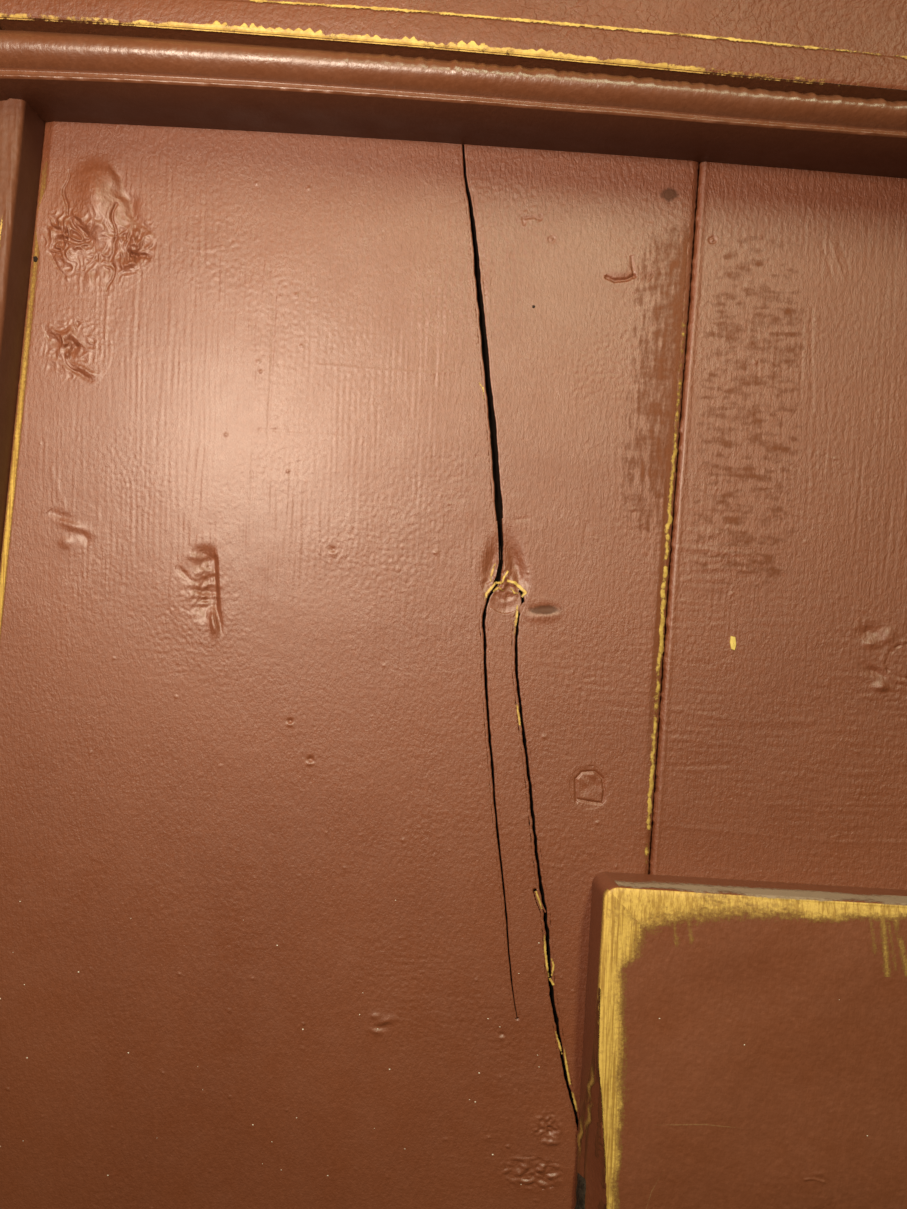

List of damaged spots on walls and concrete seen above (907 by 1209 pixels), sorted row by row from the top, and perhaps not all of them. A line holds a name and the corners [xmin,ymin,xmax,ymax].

peeling [250,0,880,55]
crack [460,144,579,1137]